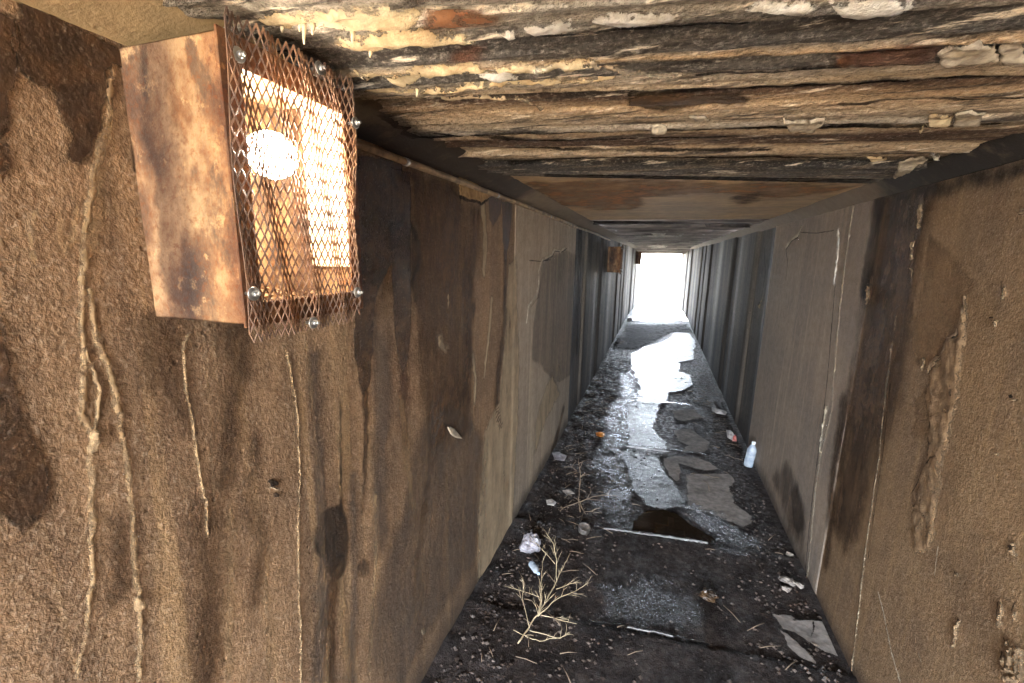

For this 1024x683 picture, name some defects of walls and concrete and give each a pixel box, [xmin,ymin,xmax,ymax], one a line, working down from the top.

corrosion [423,9,497,30]
corrosion [451,48,480,63]
peeling [651,123,667,135]
peeling [867,153,940,179]
peeling [919,110,986,134]
peeling [937,39,1024,69]
damp [0,2,131,672]
damp [148,318,219,683]
damp [220,324,249,491]
damp [298,155,519,683]
damp [824,162,1024,569]
spalling [911,296,969,554]